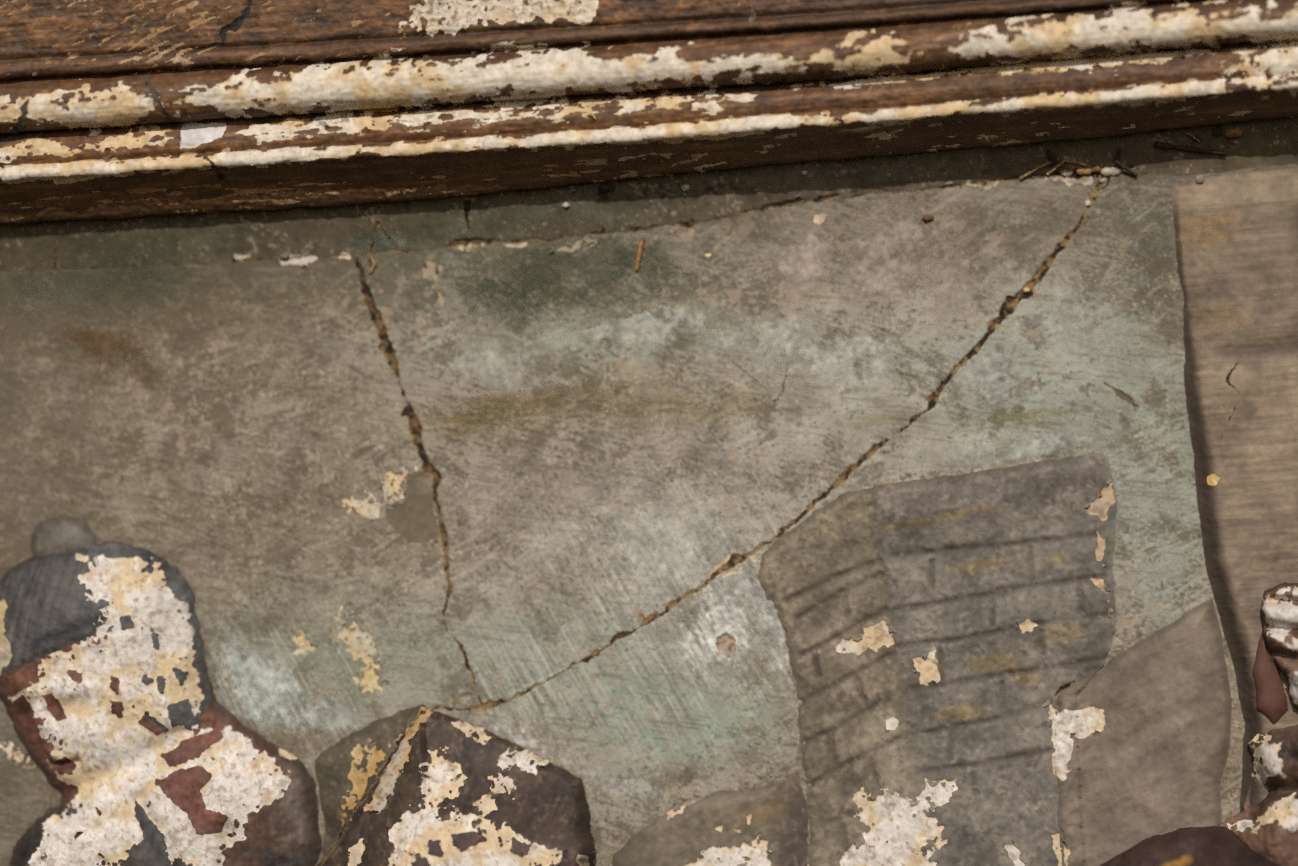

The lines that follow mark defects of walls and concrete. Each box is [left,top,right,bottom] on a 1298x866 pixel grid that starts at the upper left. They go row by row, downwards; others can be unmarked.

peeling [0,0,1298,222]
spalling [342,465,442,543]
crack [7,163,1147,866]
peeling [326,605,390,694]
peeling [1262,586,1298,651]
peeling [0,553,297,866]
peeling [341,706,590,866]
peeling [684,814,775,866]
peeling [839,778,958,866]
peeling [1051,833,1071,866]
peeling [1227,792,1298,834]
peeling [1248,734,1287,783]